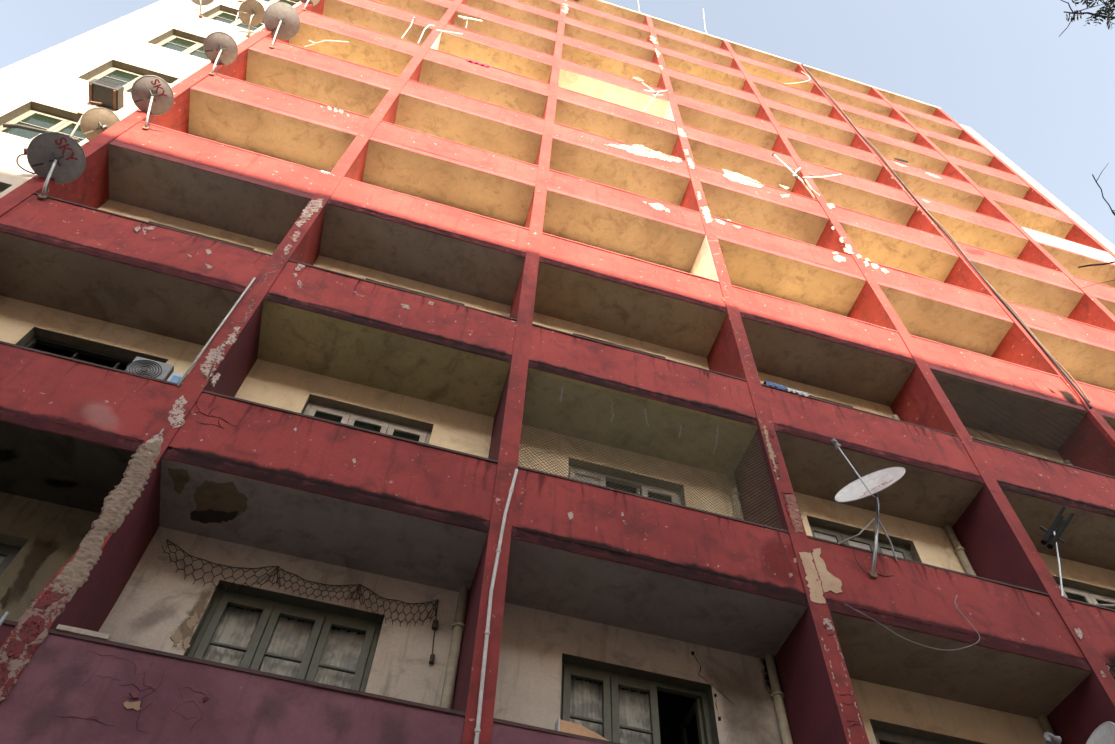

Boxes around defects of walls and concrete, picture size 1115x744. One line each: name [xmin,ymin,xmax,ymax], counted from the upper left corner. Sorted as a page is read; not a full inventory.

peeling [603,128,695,169]
peeling [722,169,765,188]
peeling [200,198,324,387]
spalling [0,395,248,701]
leakage [511,527,808,605]
peeling [773,548,864,744]
crack [55,651,209,732]
spalling [123,691,141,711]